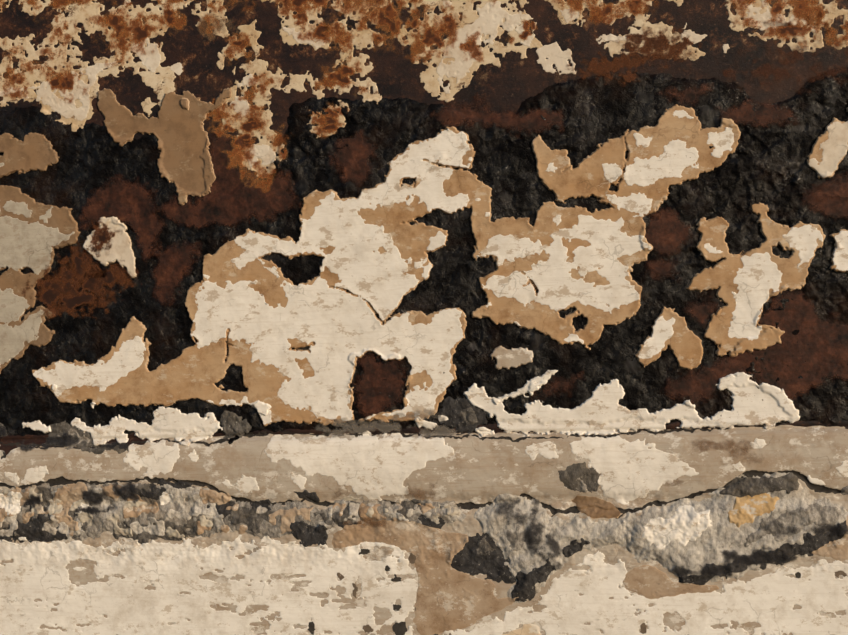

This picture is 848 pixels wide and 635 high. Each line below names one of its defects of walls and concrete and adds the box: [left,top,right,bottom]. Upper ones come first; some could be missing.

rust [2,0,90,103]
peeling [0,0,577,206]
rust [277,0,483,89]
rust [22,73,300,318]
peeling [22,104,800,519]
peeling [635,202,848,370]
rust [667,291,848,405]
crack [0,476,334,507]
peeling [0,431,848,635]
crack [456,502,492,510]
crack [520,493,580,517]
crack [615,470,848,519]